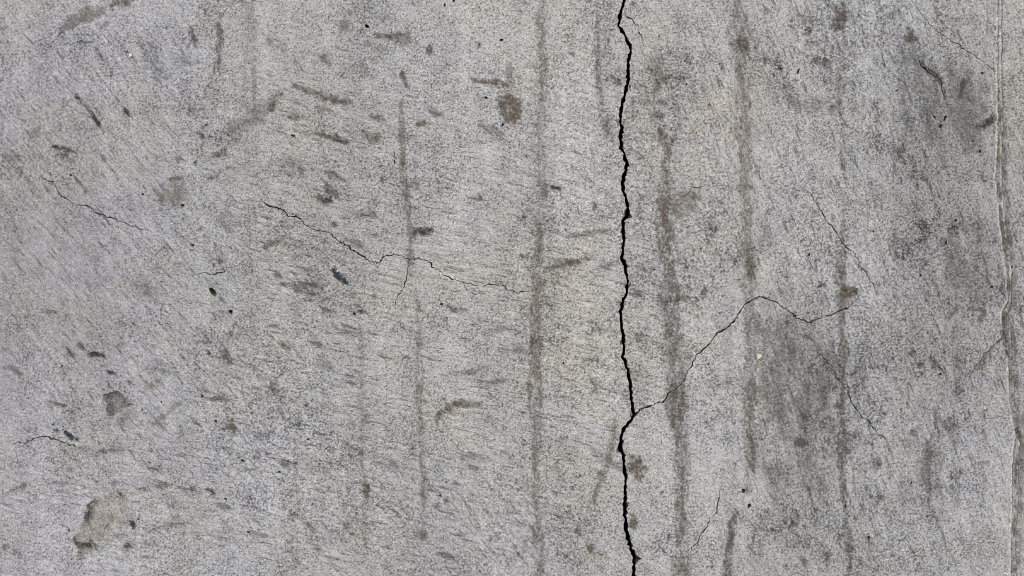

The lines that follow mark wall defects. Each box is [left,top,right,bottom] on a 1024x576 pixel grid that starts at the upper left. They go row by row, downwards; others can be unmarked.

crack [40,176,151,232]
crack [259,201,533,309]
crack [616,0,875,576]